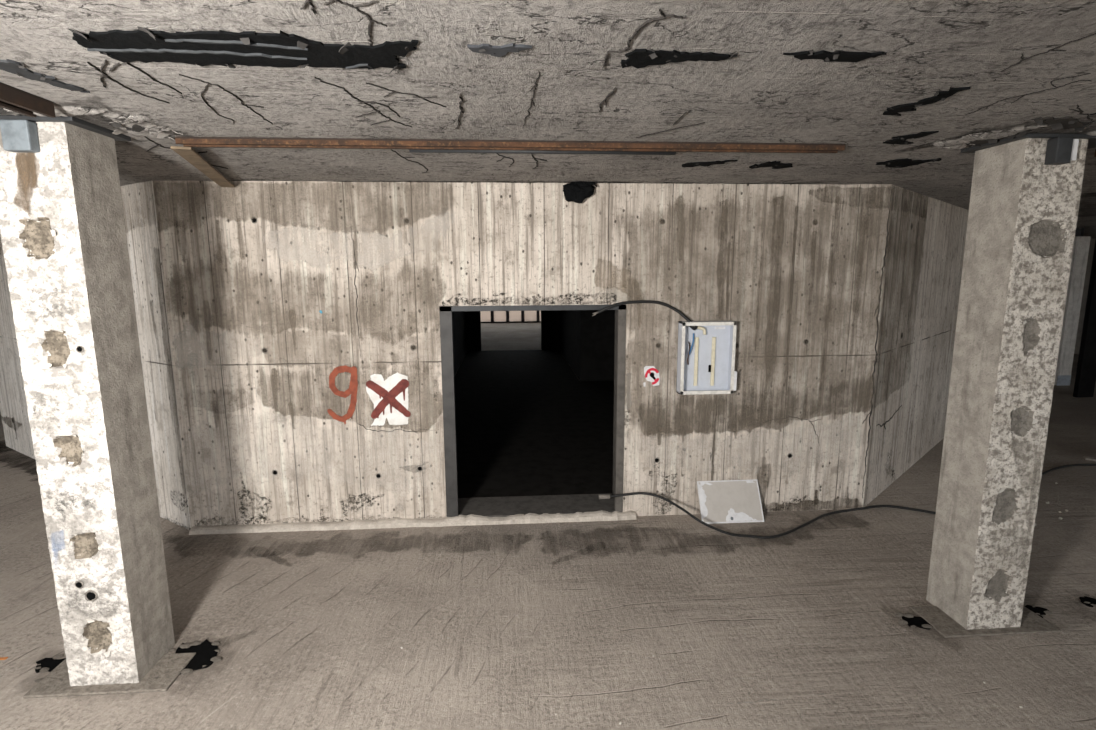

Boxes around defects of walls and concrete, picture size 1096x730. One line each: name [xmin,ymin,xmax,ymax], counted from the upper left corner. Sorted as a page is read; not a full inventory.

crack [300,0,387,44]
peeling [68,26,418,73]
crack [599,9,686,112]
peeling [621,49,738,69]
crack [87,62,273,125]
crack [314,77,464,129]
spalling [19,217,56,259]
leakage [150,179,545,345]
spalling [41,330,84,369]
leakage [594,181,927,481]
leakage [260,366,443,432]
spalling [82,619,112,658]